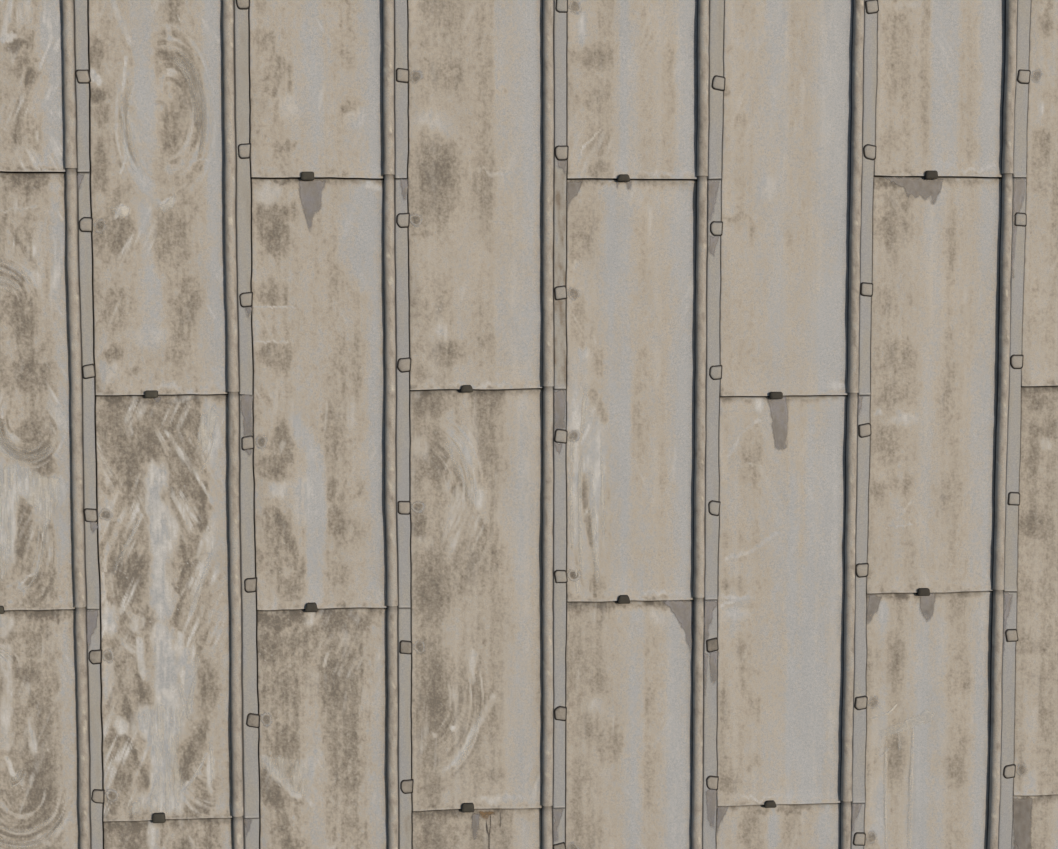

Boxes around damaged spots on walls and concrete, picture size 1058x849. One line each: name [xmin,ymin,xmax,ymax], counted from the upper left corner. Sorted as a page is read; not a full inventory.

water stain [299,180,325,228]
water stain [885,177,943,204]
water stain [768,397,788,449]
water stain [665,600,717,651]
water stain [1013,797,1032,849]